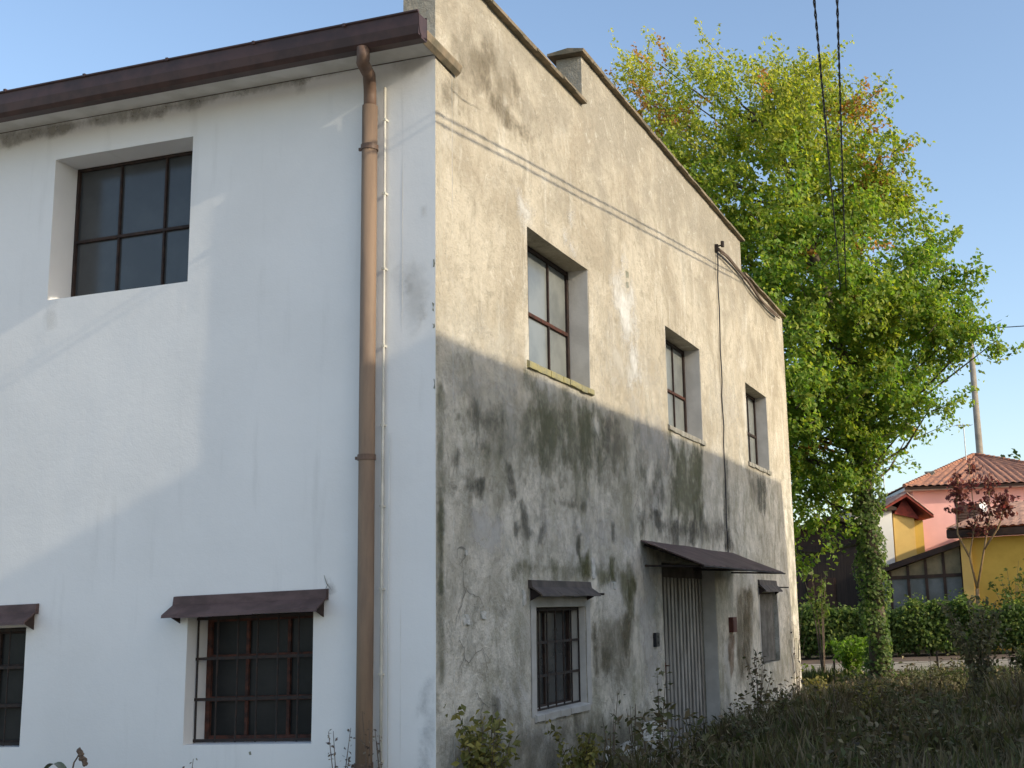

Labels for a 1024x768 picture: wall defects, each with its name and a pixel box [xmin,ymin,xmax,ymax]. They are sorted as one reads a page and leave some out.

damp [527,394,603,470]
damp [508,466,544,540]
damp [642,444,731,549]
damp [577,536,589,575]
crack [455,546,491,739]
damp [594,583,636,673]